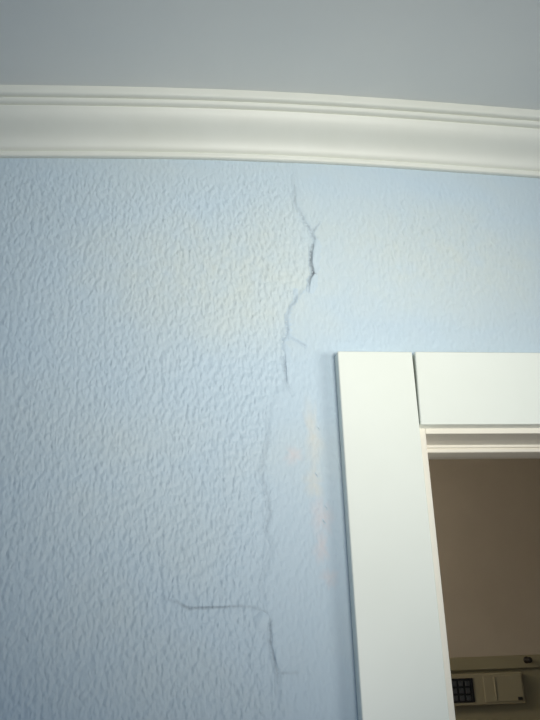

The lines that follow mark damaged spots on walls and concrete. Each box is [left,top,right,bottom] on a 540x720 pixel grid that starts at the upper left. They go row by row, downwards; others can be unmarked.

crack [281,174,322,397]
crack [157,594,300,697]